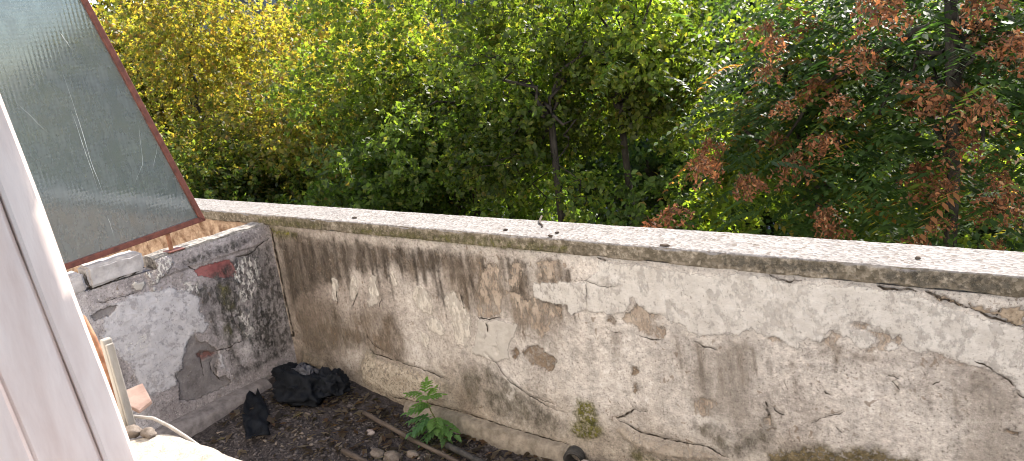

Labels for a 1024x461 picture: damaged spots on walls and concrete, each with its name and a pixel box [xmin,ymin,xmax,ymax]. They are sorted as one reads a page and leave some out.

peeling [66,218,247,401]
water stain [183,233,570,376]
crack [367,336,449,381]
peeling [412,260,1024,397]
crack [877,285,1023,327]
crack [616,409,728,458]